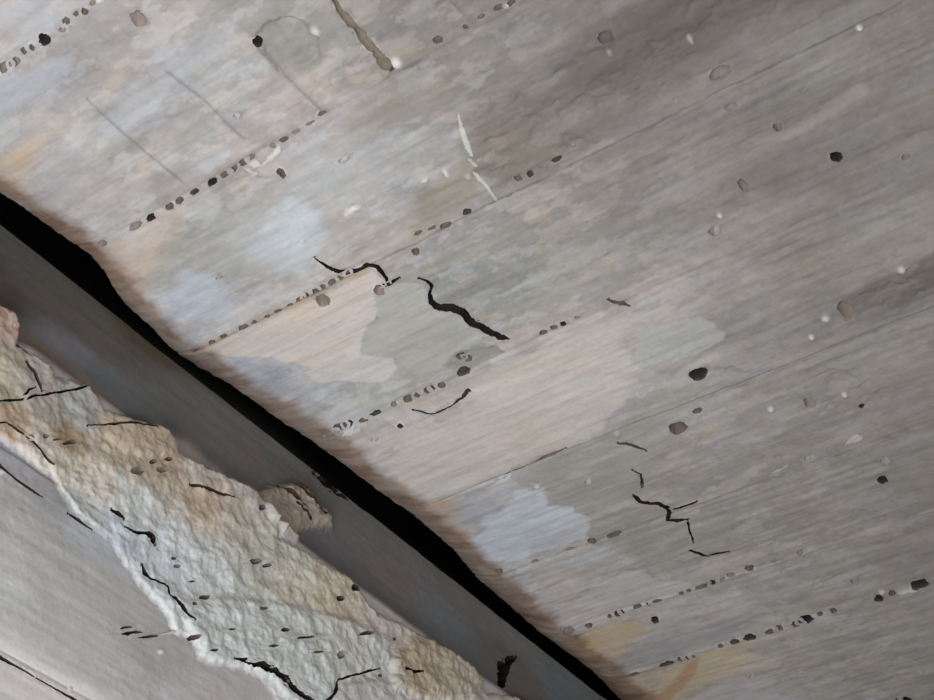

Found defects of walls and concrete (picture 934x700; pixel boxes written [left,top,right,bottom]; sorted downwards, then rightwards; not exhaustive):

spalling [124,107,331,235]
spalling [409,206,474,258]
peeling [186,268,400,384]
crack [312,256,509,342]
crack [0,384,91,467]
crack [413,388,471,416]
peeling [317,304,679,498]
spalling [666,405,705,438]
spalling [0,305,520,700]
crack [617,441,730,558]
crack [110,507,197,620]
crack [234,655,381,700]